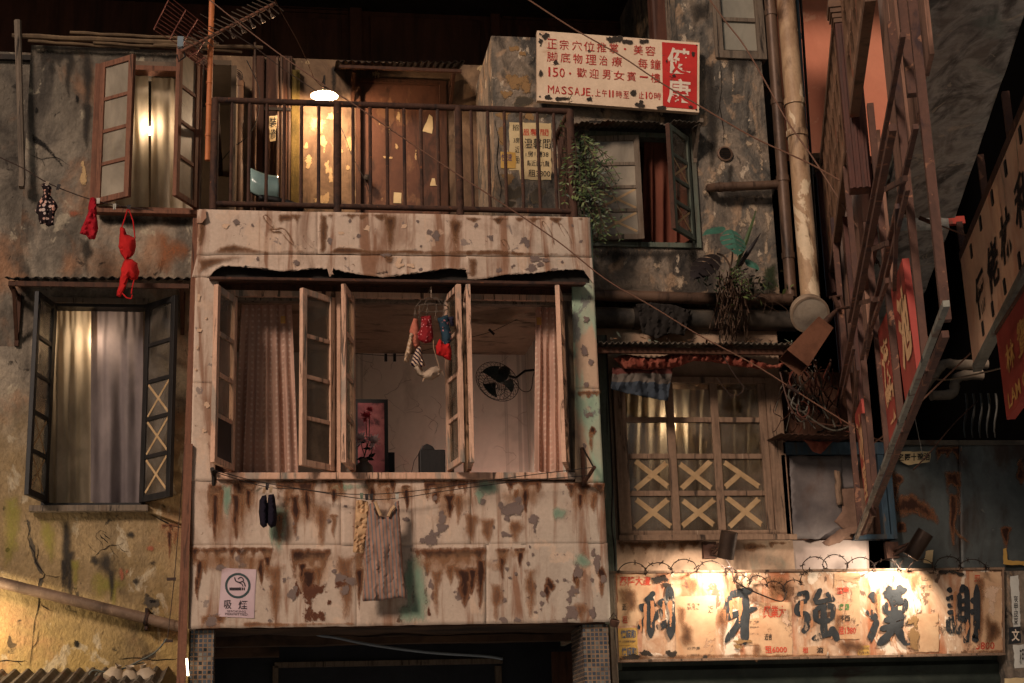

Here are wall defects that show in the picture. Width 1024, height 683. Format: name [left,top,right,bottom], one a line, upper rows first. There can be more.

rust [365,480,412,511]
peeling [419,495,449,547]
rust [424,480,468,522]
peeling [493,496,539,537]
rust [505,480,541,512]
rust [565,483,605,511]
rust [892,471,961,545]
crack [1,514,60,665]
rust [410,547,525,607]
rust [544,577,556,602]
rust [597,566,607,596]